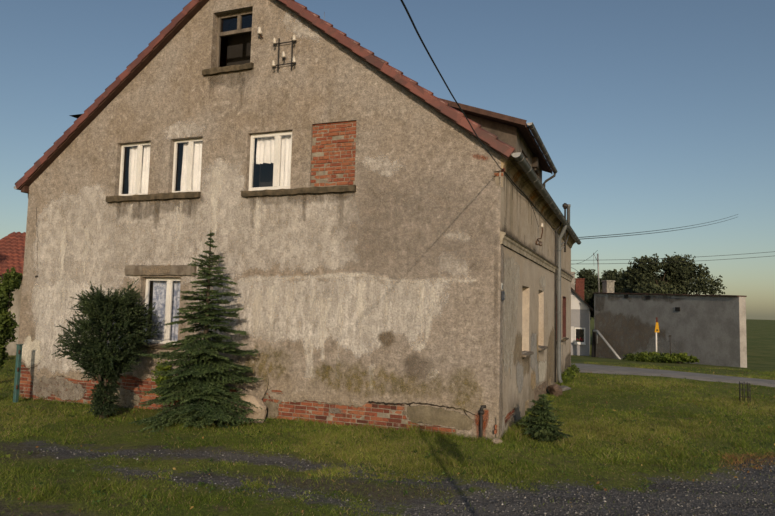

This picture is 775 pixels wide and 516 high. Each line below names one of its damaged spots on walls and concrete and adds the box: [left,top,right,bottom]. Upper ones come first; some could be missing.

peeling [20,156,468,410]
water stain [379,332,393,344]
flaking render [263,390,456,435]
crack [368,401,477,424]